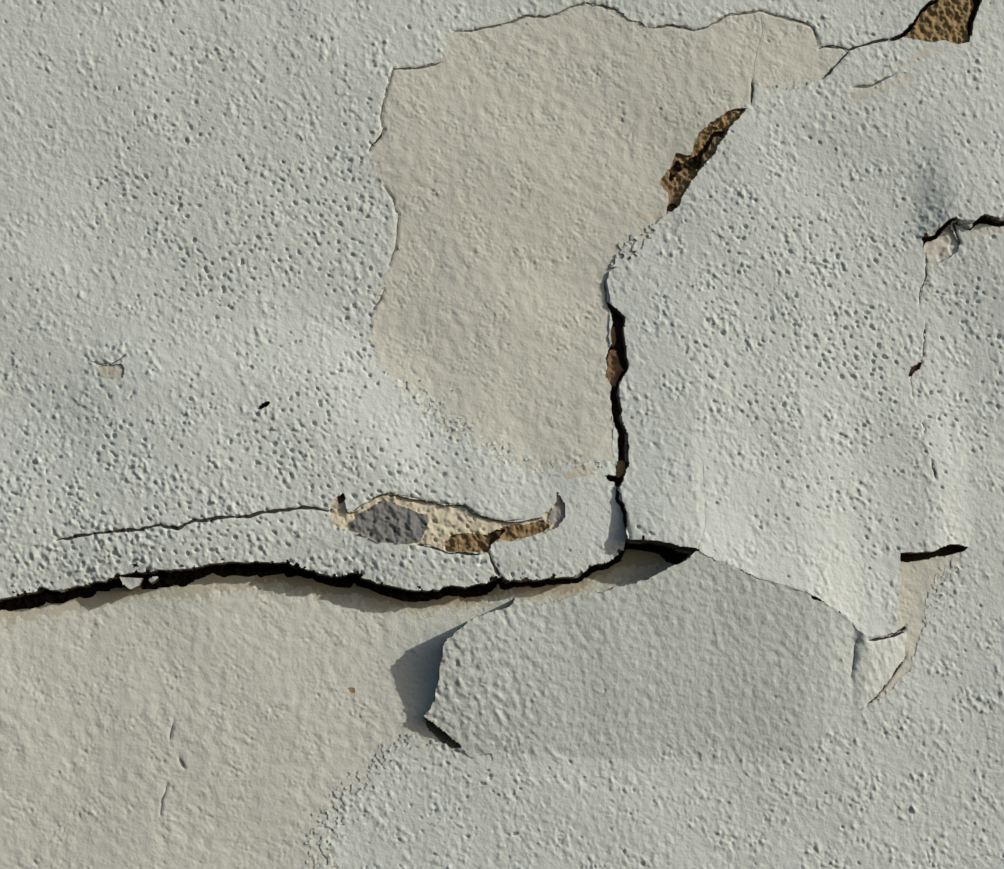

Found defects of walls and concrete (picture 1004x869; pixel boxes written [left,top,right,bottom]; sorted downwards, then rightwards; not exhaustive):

spalling [905,0,978,44]
crack [385,188,399,265]
peeling [370,3,846,480]
crack [919,218,1004,358]
crack [0,280,708,611]
spalling [330,493,565,553]
crack [900,545,965,562]
peeling [0,567,667,869]
crack [161,722,185,812]